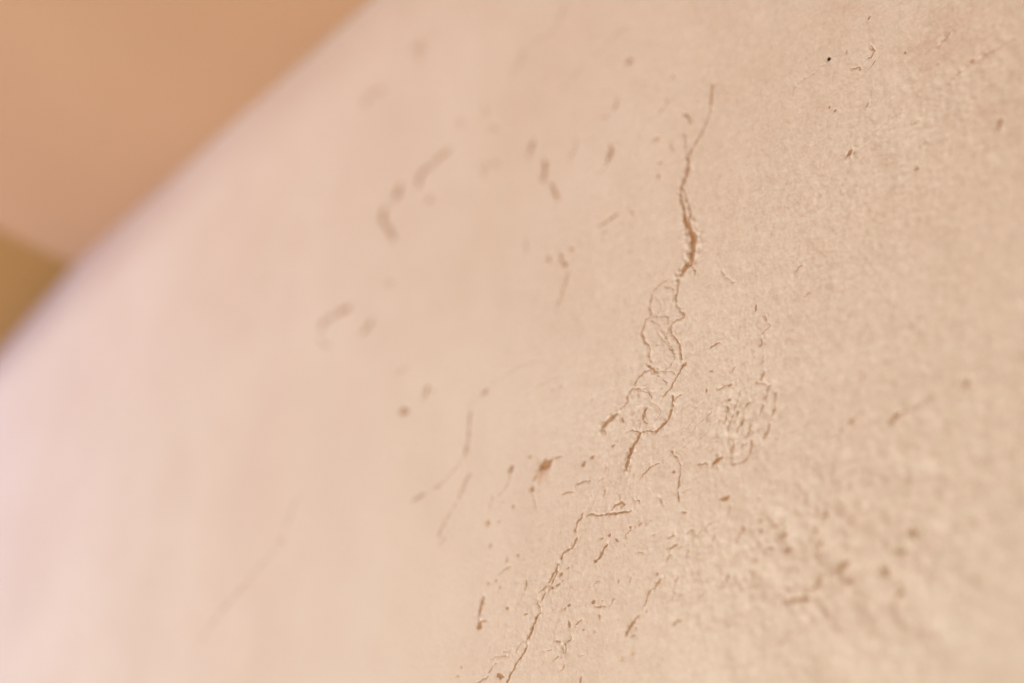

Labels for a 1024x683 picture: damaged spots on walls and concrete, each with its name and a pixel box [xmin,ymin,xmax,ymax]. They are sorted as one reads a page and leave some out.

crack [670,84,714,359]
peeling [602,280,686,470]
crack [671,450,687,514]
crack [457,501,632,683]
crack [627,573,662,636]